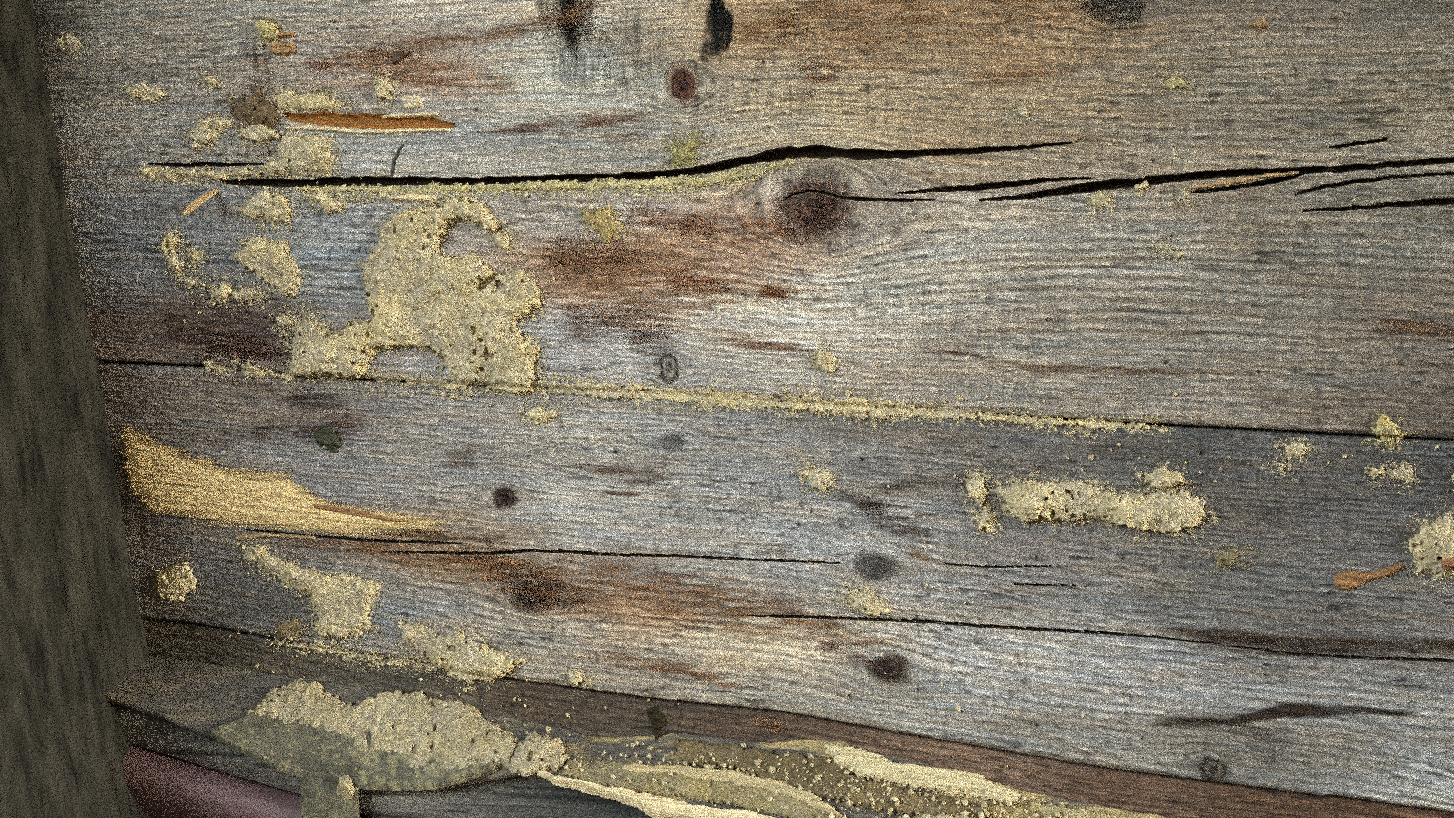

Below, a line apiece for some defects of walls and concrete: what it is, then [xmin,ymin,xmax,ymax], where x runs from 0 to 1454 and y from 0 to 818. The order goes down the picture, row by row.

peeling [268,32,297,56]
peeling [390,51,409,65]
spalling [238,111,455,144]
crack [147,138,1454,211]
peeling [163,247,206,290]
peeling [232,288,263,301]